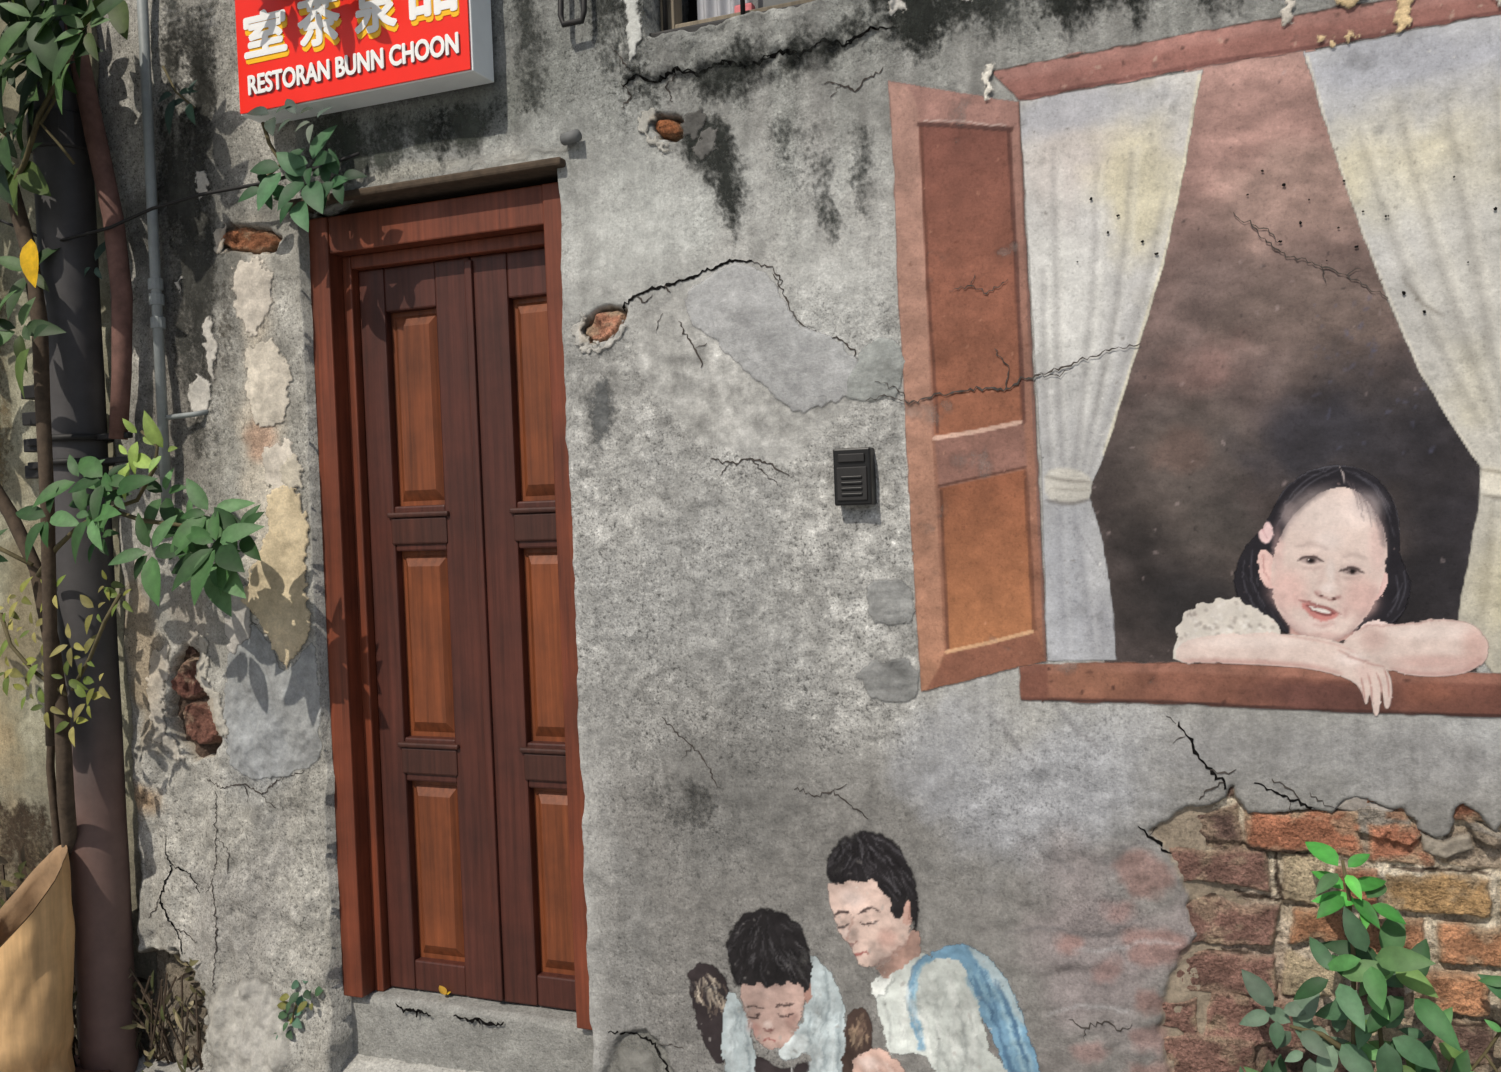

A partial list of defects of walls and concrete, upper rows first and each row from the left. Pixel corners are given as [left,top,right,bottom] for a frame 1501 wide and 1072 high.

leakage [156,0,234,456]
peeling [195,171,209,199]
leakage [512,0,547,111]
spalling [637,108,718,160]
crack [611,26,897,108]
leakage [587,0,1147,239]
spalling [571,309,628,354]
crack [622,259,1141,404]
peeling [145,223,311,763]
crack [1166,716,1336,811]
crack [1138,826,1172,854]
spalling [1162,787,1501,1072]